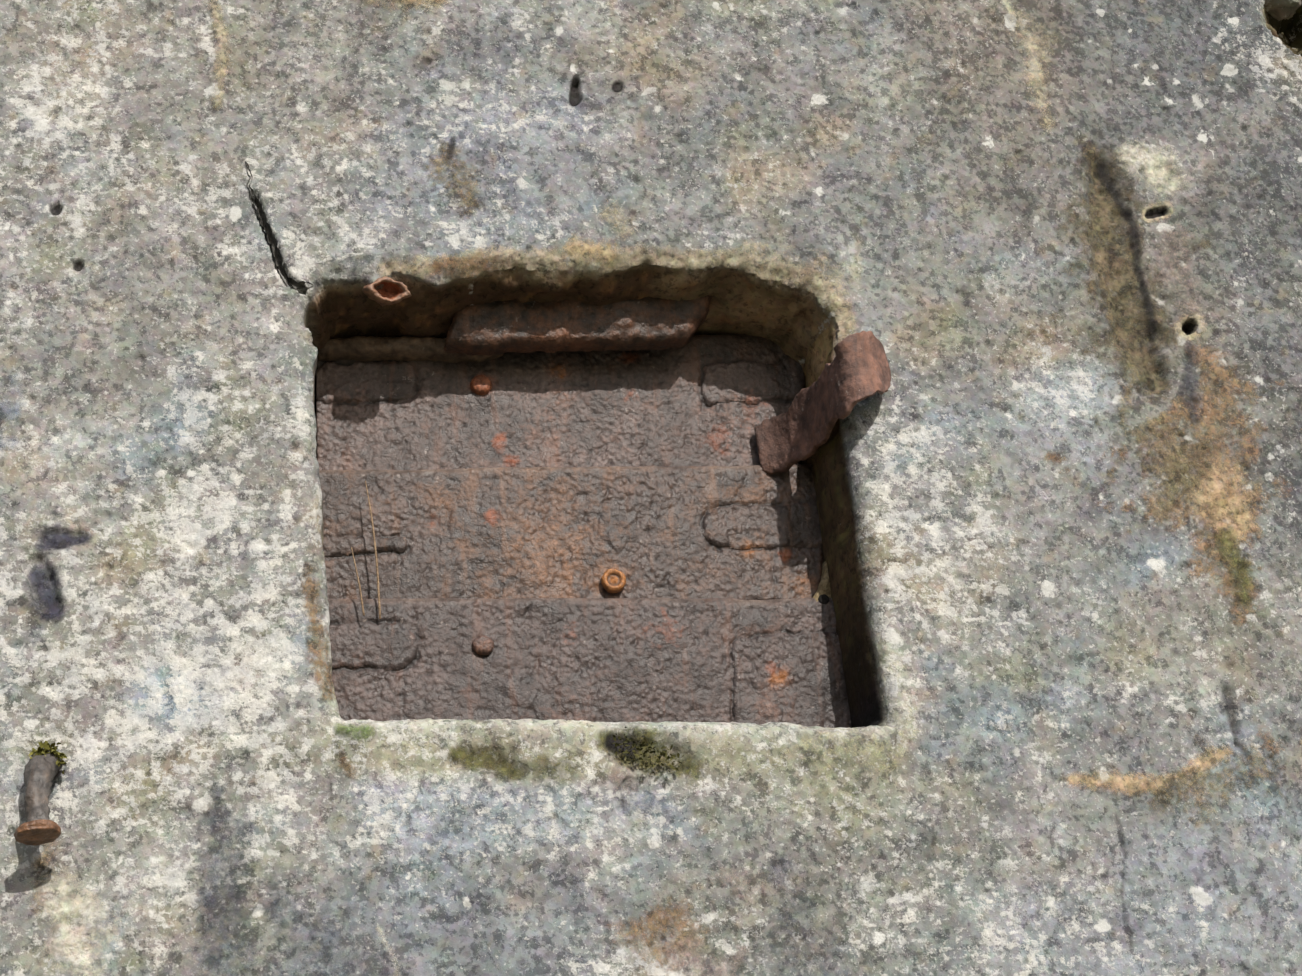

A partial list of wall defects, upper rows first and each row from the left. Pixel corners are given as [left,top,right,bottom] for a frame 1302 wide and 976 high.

crack [245,162,313,289]
rust [303,564,335,700]
rust [340,752,356,777]
rust [336,724,374,738]